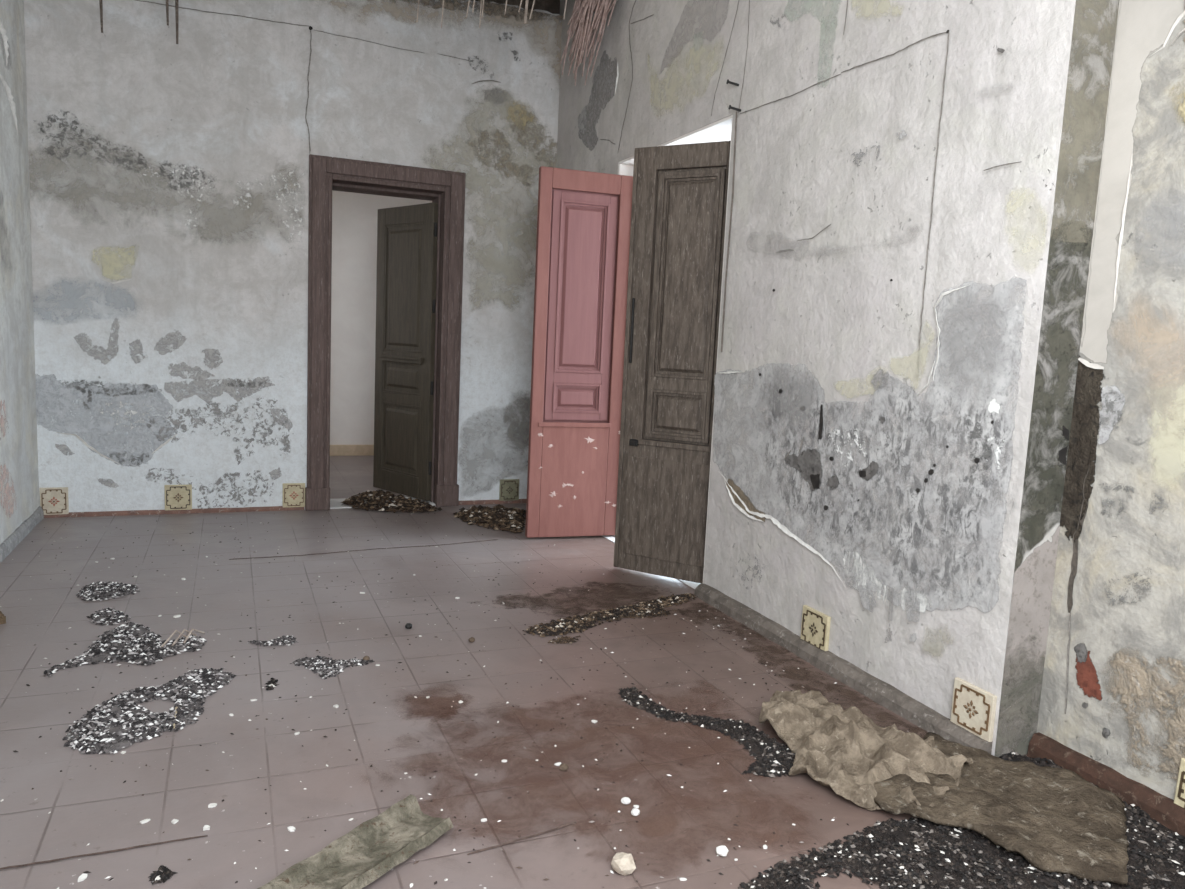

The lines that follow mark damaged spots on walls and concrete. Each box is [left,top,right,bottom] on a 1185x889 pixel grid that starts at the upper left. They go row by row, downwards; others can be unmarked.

peeling [578,50,619,151]
damp [431,56,557,308]
crack [711,0,949,381]
damp [713,0,1120,613]
peeling [35,318,292,509]
damp [461,394,530,490]
flaking render [724,479,766,523]
flaking render [784,405,839,491]
flaking render [858,461,878,481]
damp [1098,385,1125,445]
damp [1101,484,1134,515]
corrosion [1074,643,1102,708]